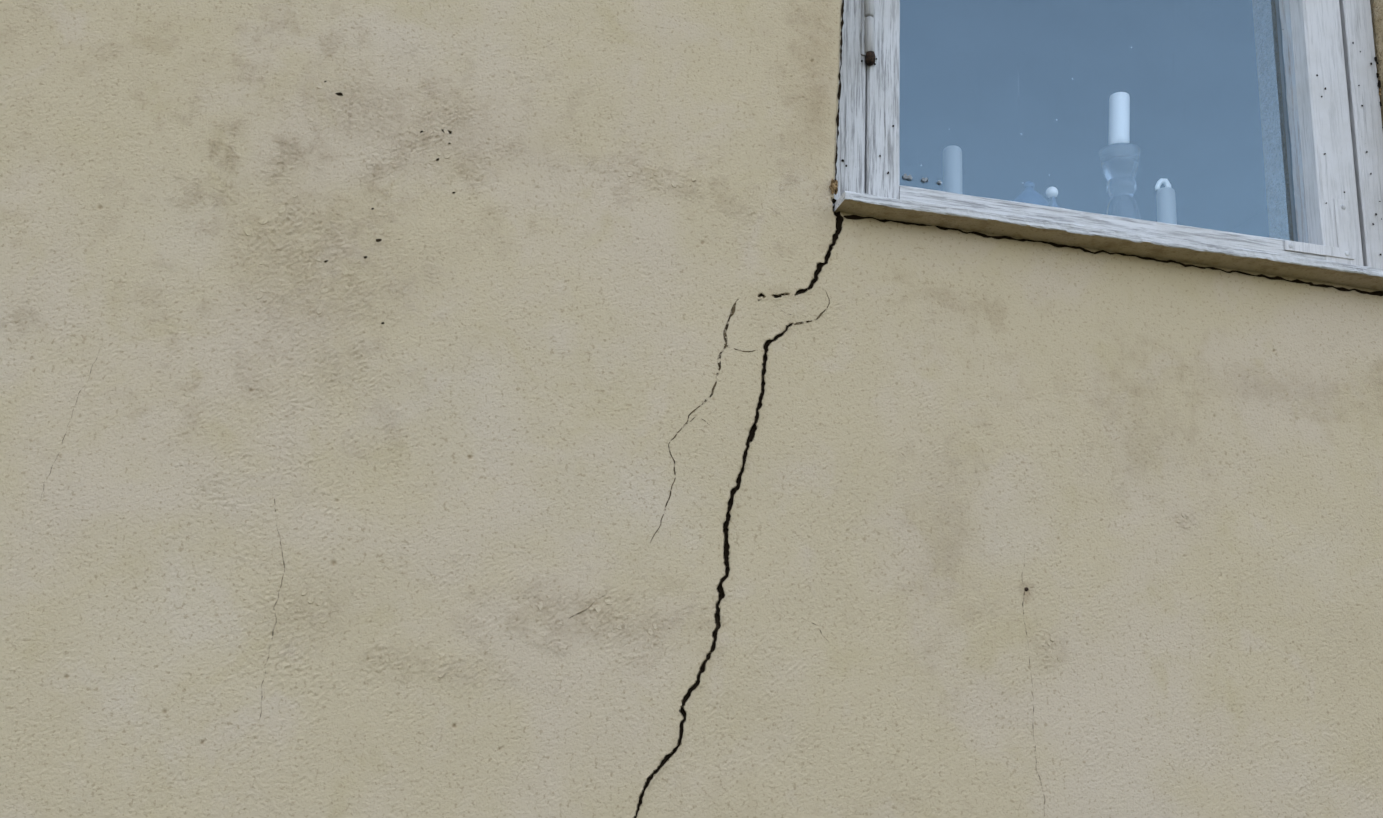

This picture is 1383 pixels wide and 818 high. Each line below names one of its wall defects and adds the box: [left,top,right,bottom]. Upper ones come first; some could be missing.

crack [635,0,1383,818]